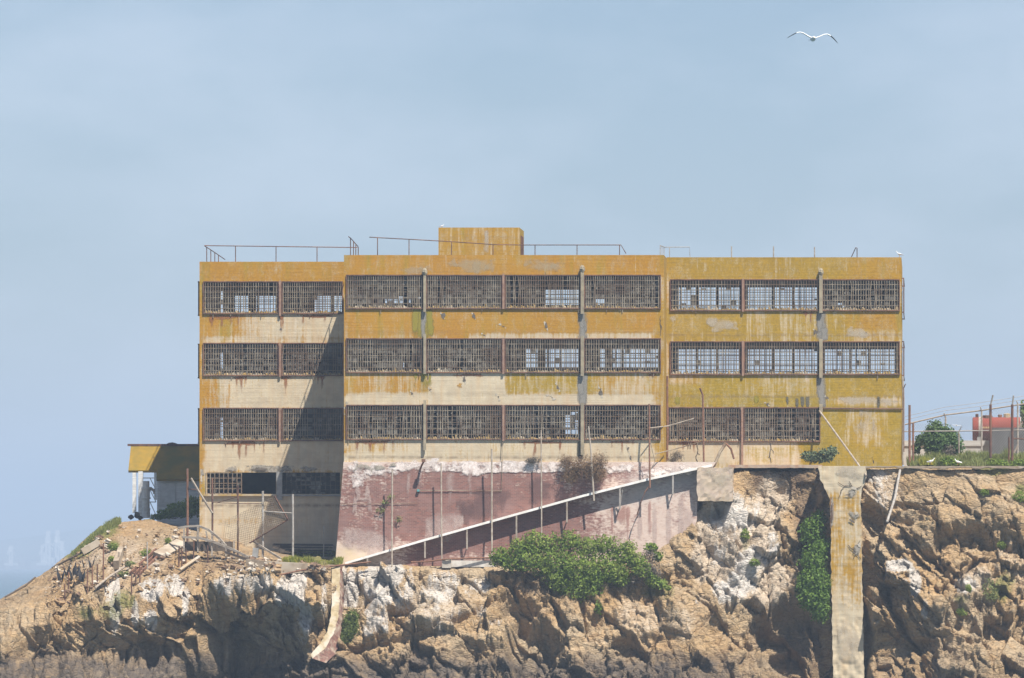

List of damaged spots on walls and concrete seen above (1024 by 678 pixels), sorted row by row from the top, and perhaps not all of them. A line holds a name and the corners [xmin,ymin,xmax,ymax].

leakage [817,312,828,340]
leakage [577,373,588,405]
rust [225,441,264,458]
peeling [348,445,697,487]